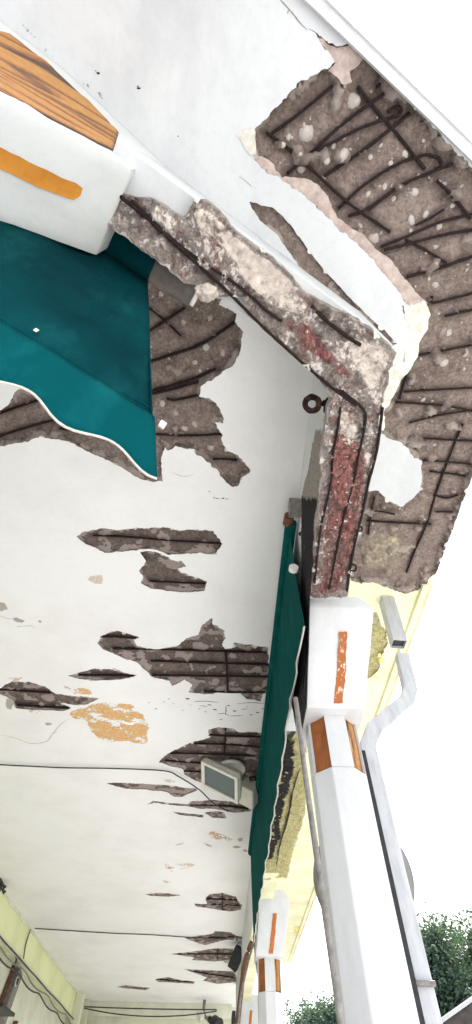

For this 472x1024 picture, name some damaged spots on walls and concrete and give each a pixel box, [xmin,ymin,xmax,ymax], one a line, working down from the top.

spalling [0,29,472,599]
rust [284,318,350,378]
rust [320,434,366,595]
spalling [0,618,269,818]
mould [267,741,295,860]
spalling [119,931,239,990]
spalling [195,893,242,911]